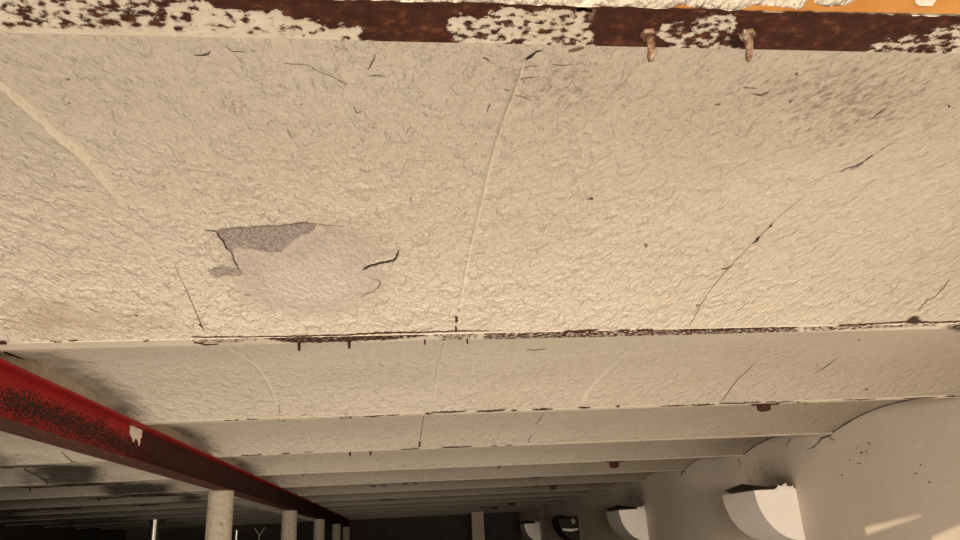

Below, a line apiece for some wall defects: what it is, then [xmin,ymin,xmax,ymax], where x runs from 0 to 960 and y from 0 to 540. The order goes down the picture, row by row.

rust [0,0,960,54]
crack [841,138,899,172]
peeling [206,222,333,278]
crack [690,196,804,324]
crack [175,266,205,332]
rust [193,321,960,346]
rust [0,381,345,525]